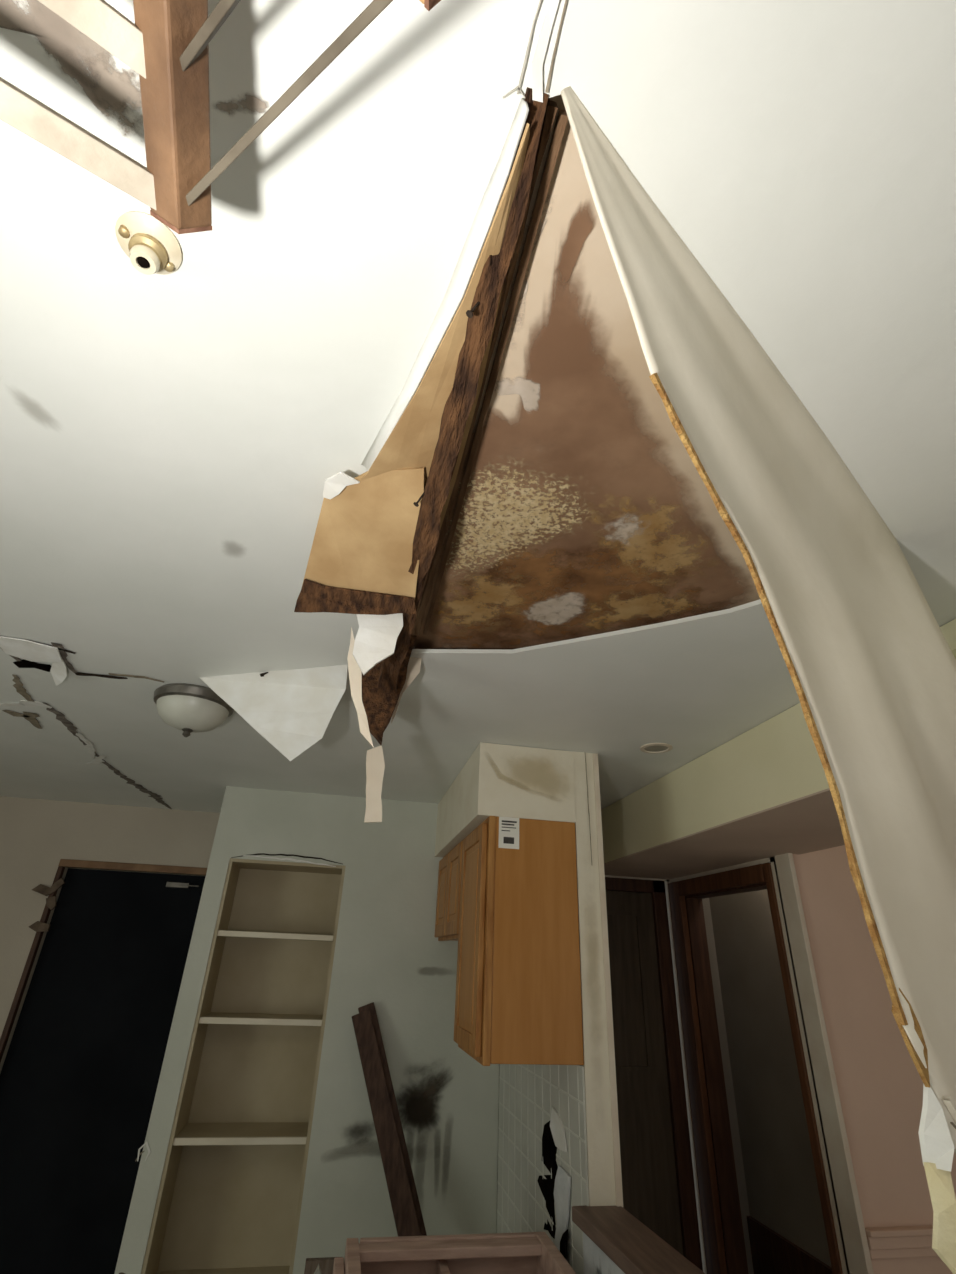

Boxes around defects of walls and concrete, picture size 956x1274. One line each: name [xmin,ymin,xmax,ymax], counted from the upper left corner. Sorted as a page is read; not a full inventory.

damp [0,0,142,135]
damp [216,94,267,114]
crack [503,0,568,102]
damp [294,206,748,650]
crack [0,636,172,809]
damp [396,1075,446,1127]
spalling [537,1107,571,1261]
peeling [891,988,956,1274]